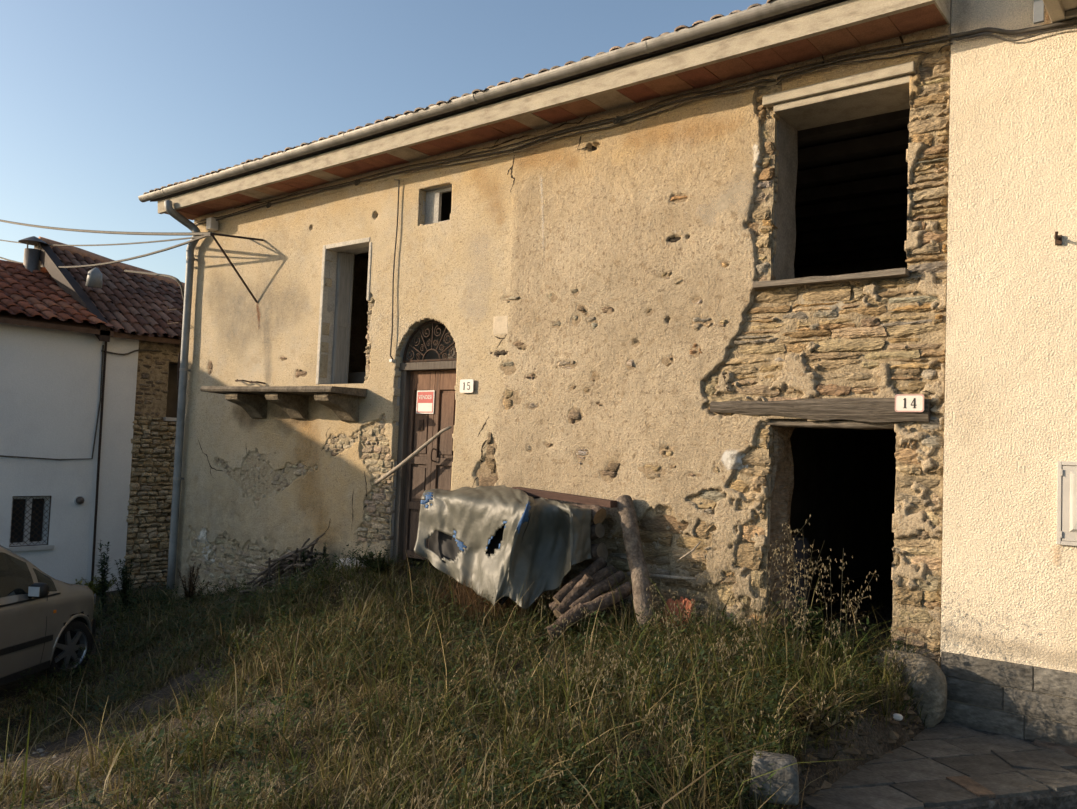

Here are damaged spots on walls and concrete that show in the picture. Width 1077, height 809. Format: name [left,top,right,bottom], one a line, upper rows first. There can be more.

crack [459,116,592,192]
flaking render [690,297,729,358]
flaking render [703,50,950,667]
flaking render [568,408,584,424]
flaking render [215,449,319,509]
flaking render [324,415,396,545]
flaking render [475,432,499,486]
flaking render [600,460,621,482]
flaking render [188,526,292,598]
flaking render [563,561,594,587]
flaking render [591,517,634,625]
flaking render [638,419,775,639]